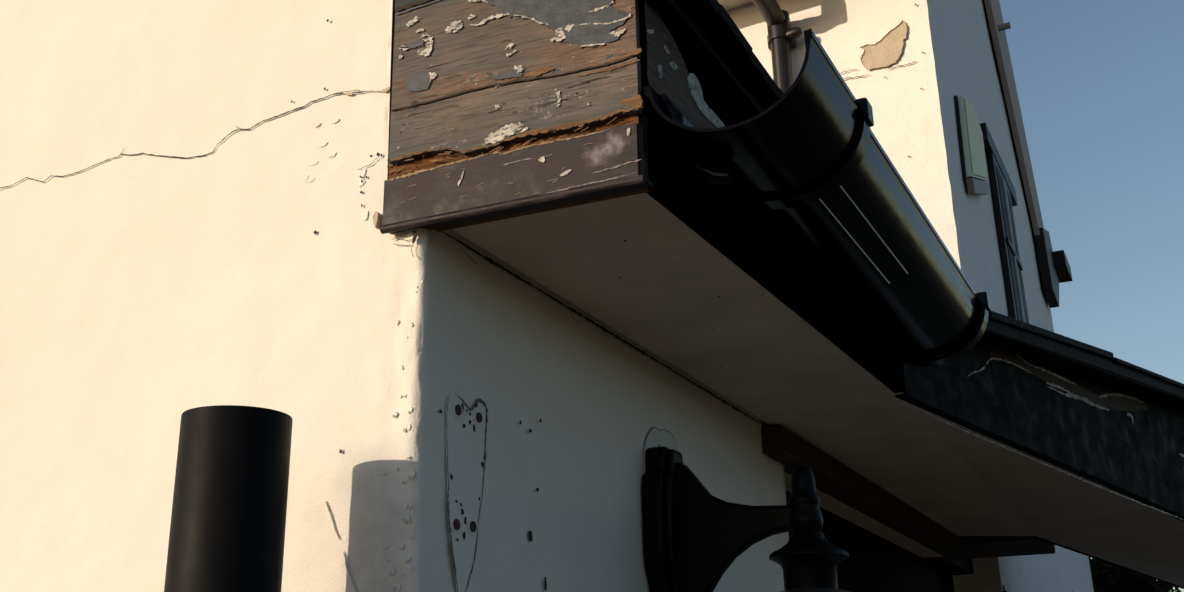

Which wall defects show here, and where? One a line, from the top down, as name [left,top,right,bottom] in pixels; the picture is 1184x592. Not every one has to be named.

peeling [393,0,725,144]
spalling [860,20,907,78]
crack [1,87,390,188]
peeling [357,152,382,229]
peeling [967,346,1148,423]
peeling [914,407,1184,520]